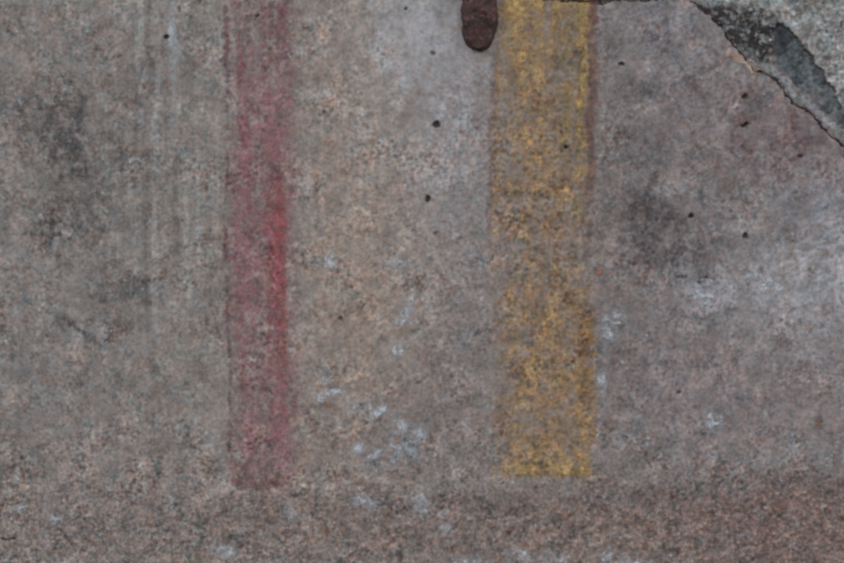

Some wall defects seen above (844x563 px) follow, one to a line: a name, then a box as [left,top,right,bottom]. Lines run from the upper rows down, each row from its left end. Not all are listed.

crack [543,0,621,8]
crack [693,2,844,147]
spalling [772,23,844,124]